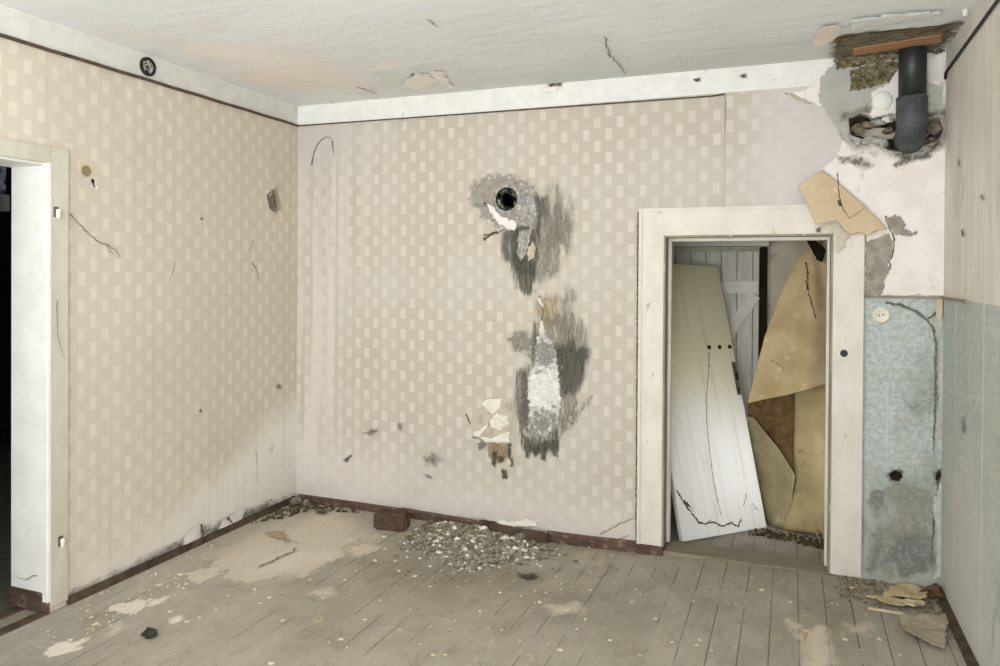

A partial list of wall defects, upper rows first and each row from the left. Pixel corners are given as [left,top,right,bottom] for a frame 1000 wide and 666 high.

peeling [811,10,943,47]
peeling [388,58,481,96]
flaking render [787,59,946,157]
crack [69,213,120,257]
spalling [468,174,537,241]
peeling [527,241,536,260]
crack [884,216,895,270]
flaking render [864,214,917,296]
crack [885,301,938,450]
peeling [473,398,511,444]
water stain [133,390,253,523]
water stain [856,413,1000,666]